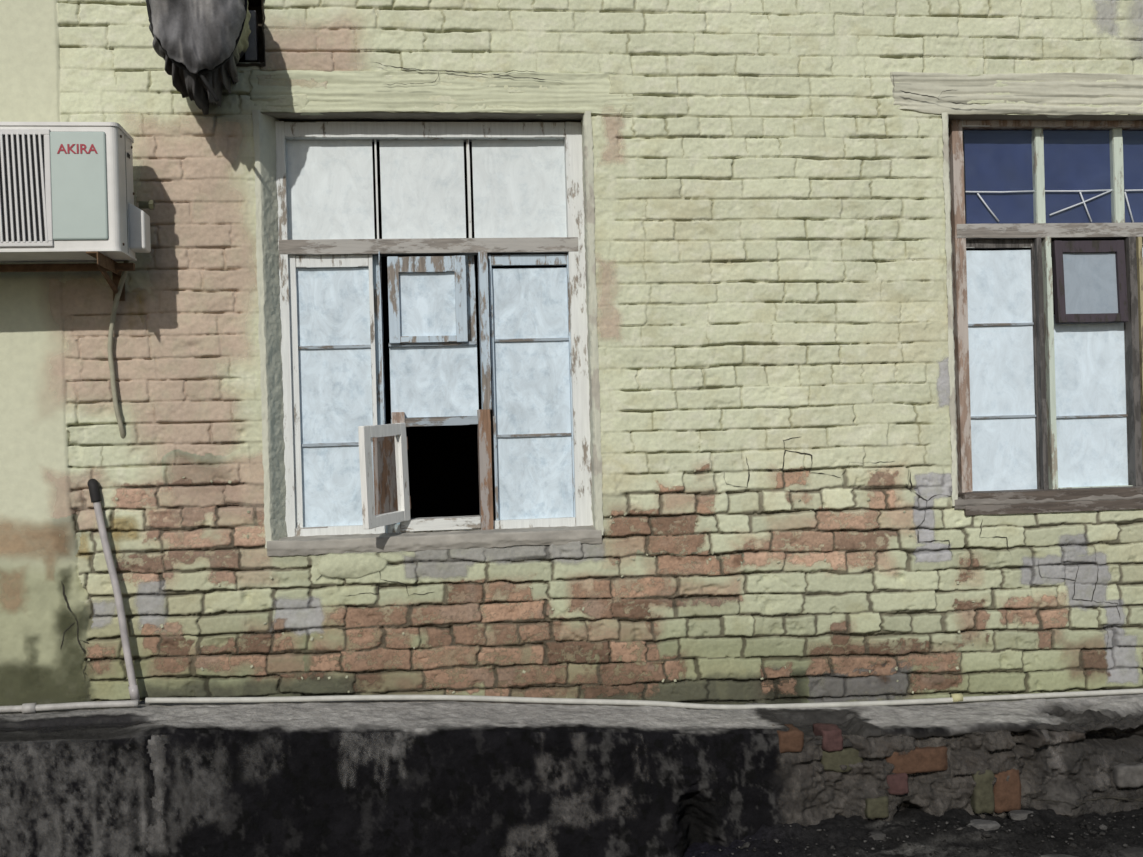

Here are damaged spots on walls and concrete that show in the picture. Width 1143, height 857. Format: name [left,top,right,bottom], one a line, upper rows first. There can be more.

peeling [113,477,266,586]
water stain [137,581,165,627]
water stain [274,597,323,634]
peeling [141,467,913,699]
peeling [760,594,1069,694]
peeling [956,558,979,584]
peeling [1080,647,1111,676]
water stain [0,602,224,857]
water stain [341,732,406,786]
water stain [536,757,596,825]
spalling [756,709,1143,826]
water stain [506,824,556,857]